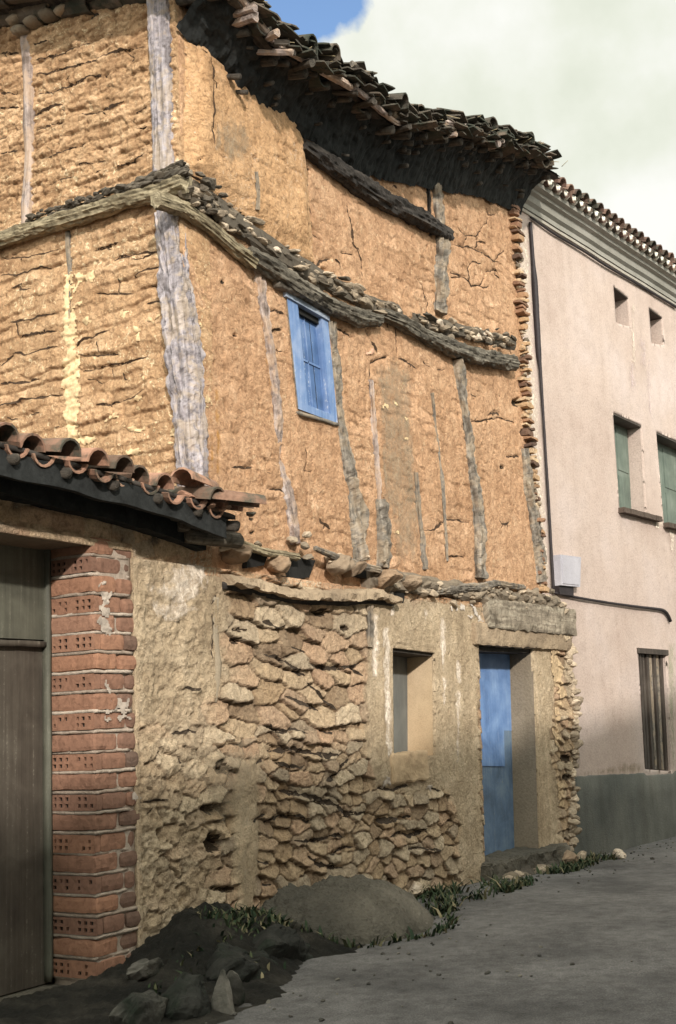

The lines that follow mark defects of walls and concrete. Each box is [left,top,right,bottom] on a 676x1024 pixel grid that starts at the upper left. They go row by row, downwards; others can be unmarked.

crack [306,162,363,276]
crack [450,212,504,288]
crack [471,394,513,423]
spalling [213,759,233,775]
spalling [203,833,221,853]